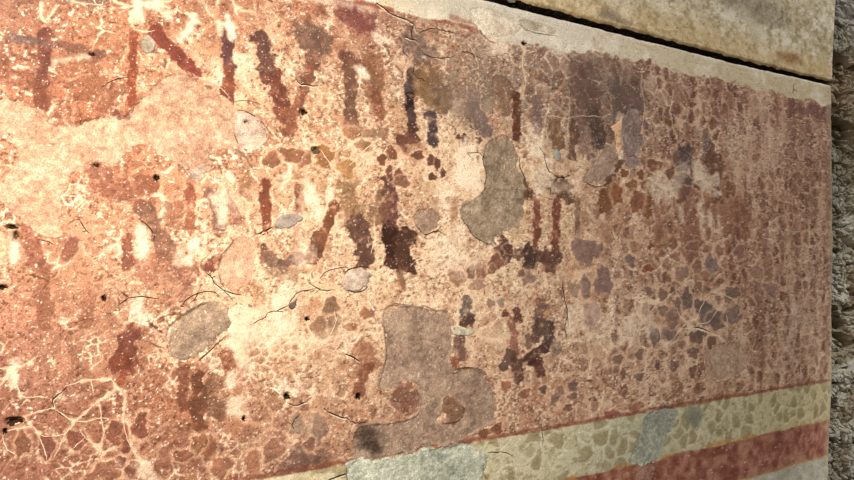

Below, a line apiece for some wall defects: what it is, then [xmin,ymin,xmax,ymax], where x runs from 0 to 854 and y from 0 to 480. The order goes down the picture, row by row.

crack [375,2,481,80]
flaking render [0,69,269,239]
flaking render [460,137,528,245]
flaking render [167,302,231,360]
crack [0,357,140,463]
flaking render [345,301,497,480]
flaking render [630,408,679,480]